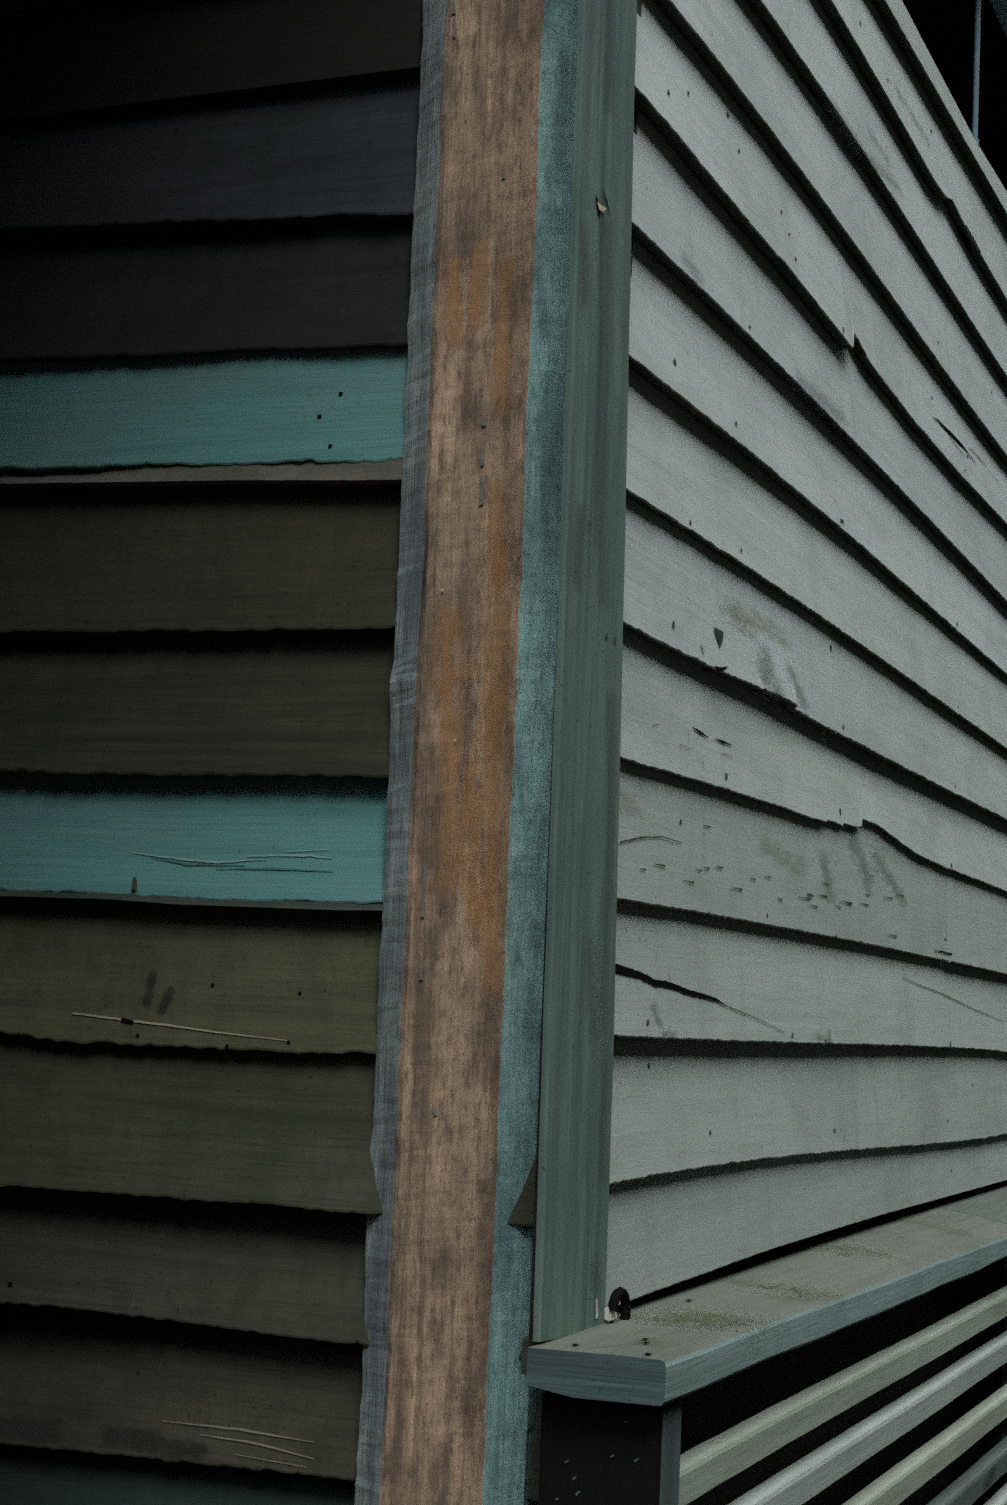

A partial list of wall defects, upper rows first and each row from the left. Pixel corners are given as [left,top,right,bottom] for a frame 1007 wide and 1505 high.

crack [934,417,994,476]
crack [615,964,786,1033]